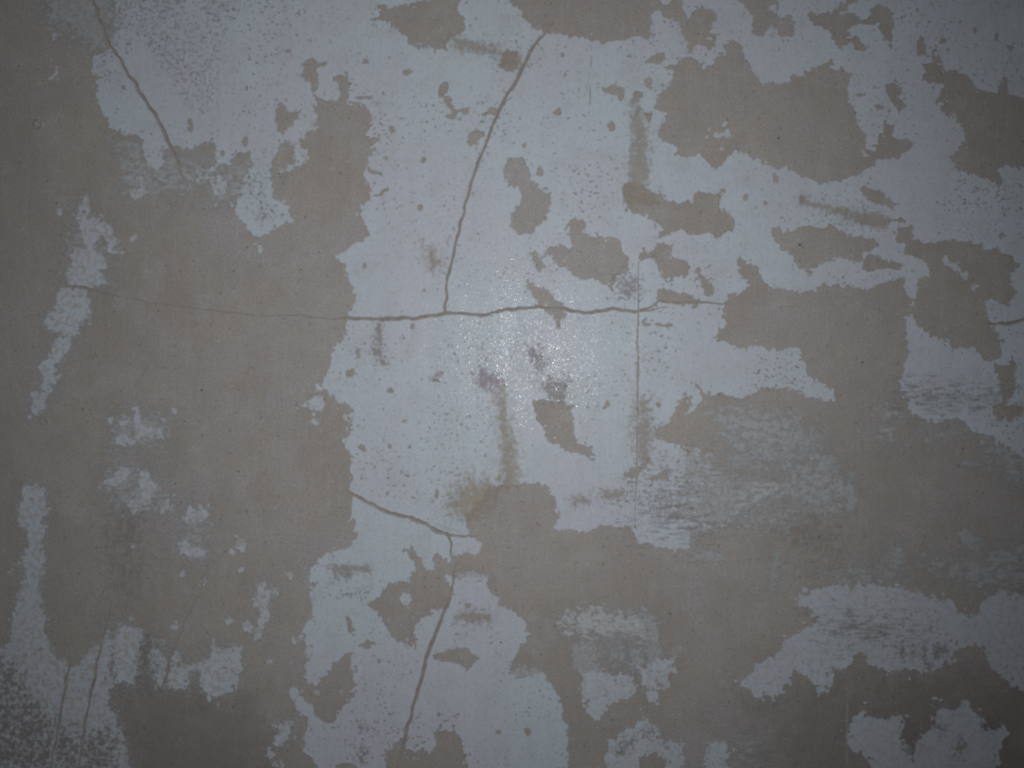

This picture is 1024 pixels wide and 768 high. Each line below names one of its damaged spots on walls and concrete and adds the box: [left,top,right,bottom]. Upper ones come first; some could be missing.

peeling [0,0,395,768]
crack [60,0,733,497]
crack [346,489,477,768]
peeling [336,0,1024,768]